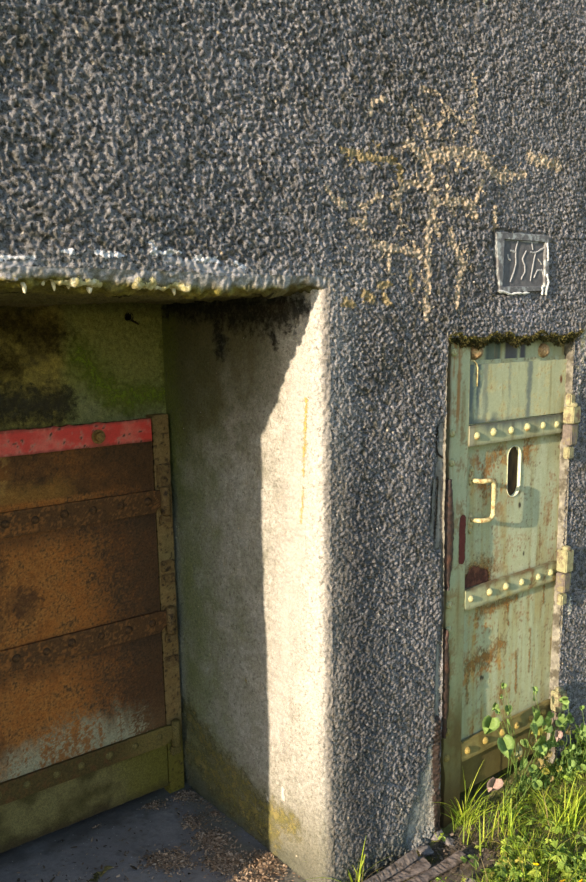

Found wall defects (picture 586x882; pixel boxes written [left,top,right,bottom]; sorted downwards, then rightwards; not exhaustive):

leakage [131,276,311,499]
rust [482,447,503,498]
rust [465,558,498,588]
rust [476,594,518,626]